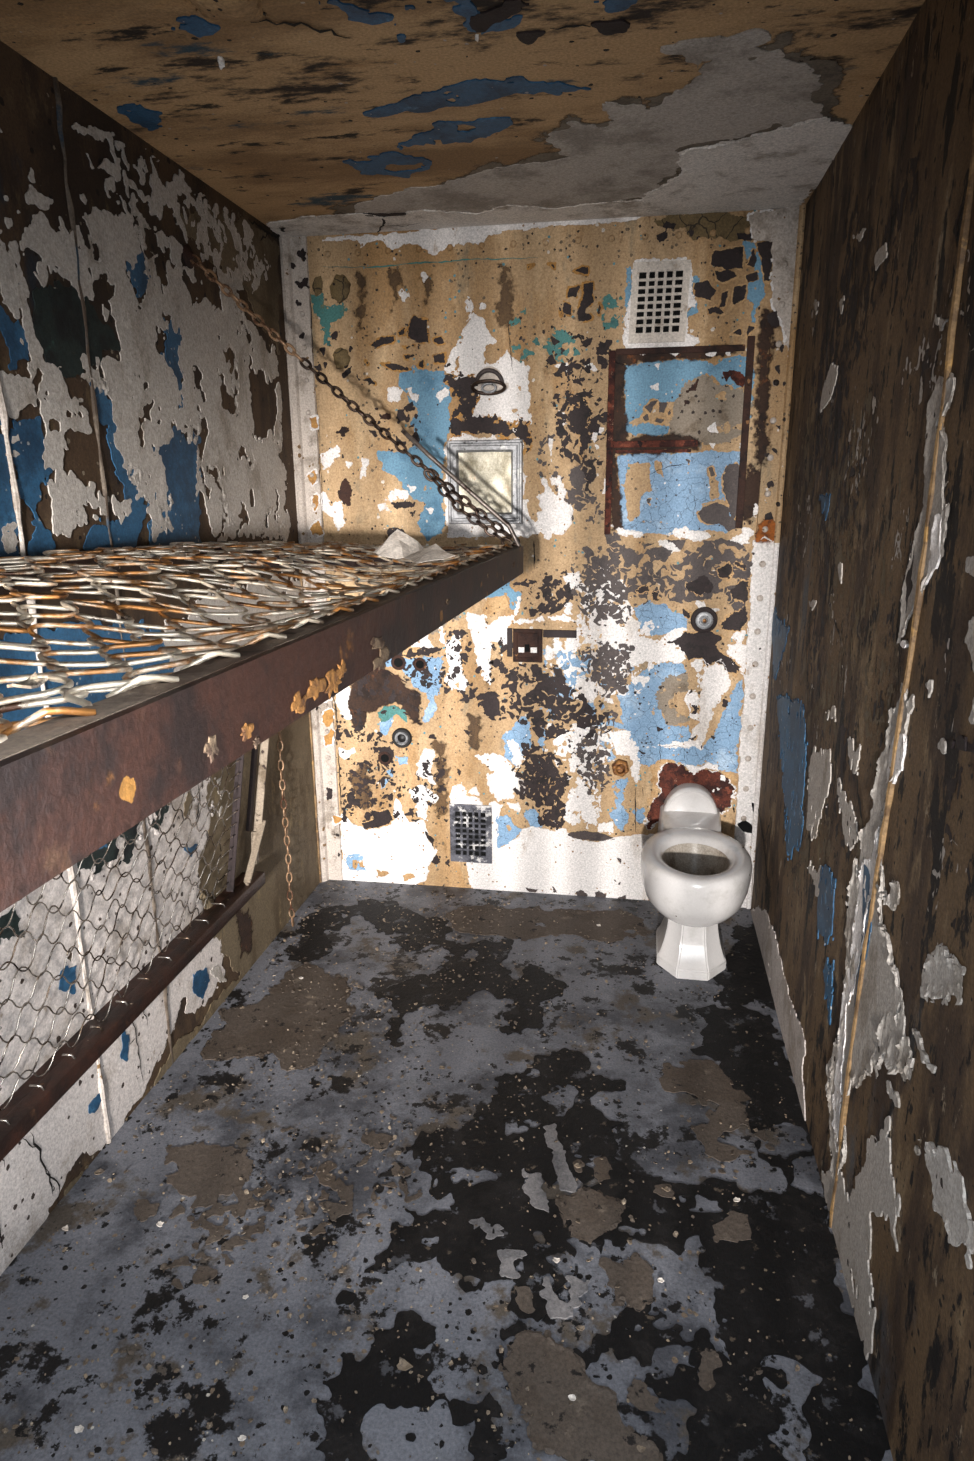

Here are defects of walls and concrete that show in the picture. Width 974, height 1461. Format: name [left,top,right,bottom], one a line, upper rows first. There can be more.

peeling [319,0,415,43]
spalling [444,0,545,45]
spalling [591,0,638,35]
peeling [0,28,852,563]
corrosion [605,344,736,531]
peeling [884,250,970,648]
peeling [0,571,302,730]
peeling [965,616,974,671]
spalling [316,150,937,1461]
peeling [0,712,652,1289]
peeling [920,943,966,1006]
peeling [914,1139,974,1269]